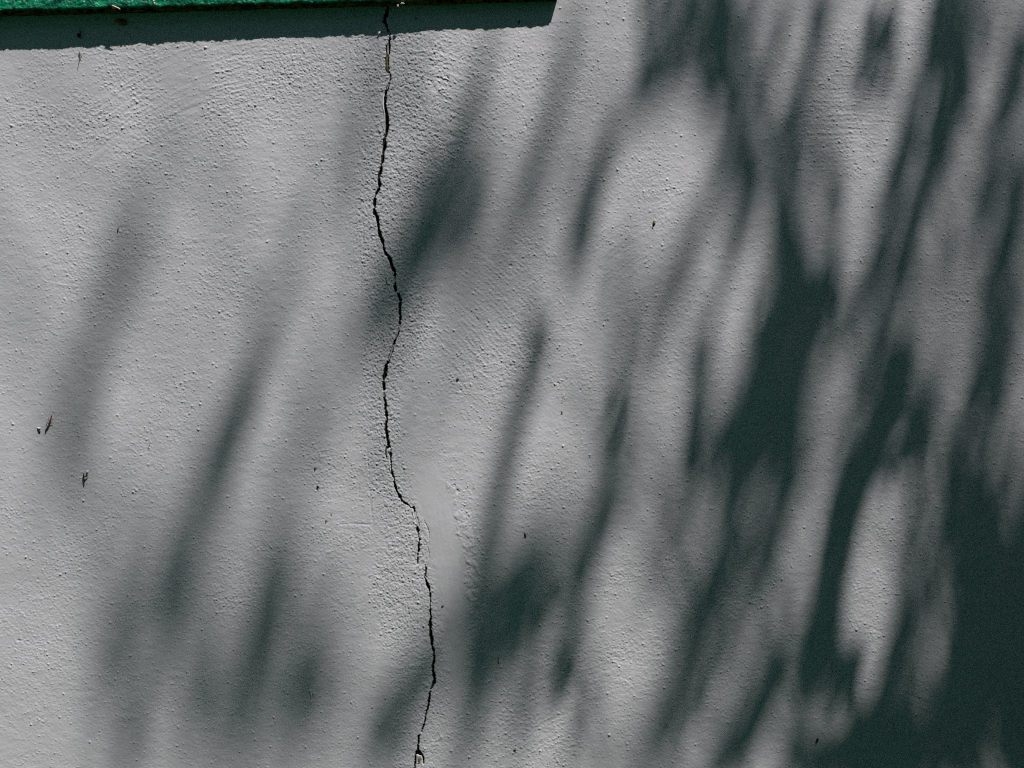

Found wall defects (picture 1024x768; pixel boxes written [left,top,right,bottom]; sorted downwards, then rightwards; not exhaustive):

crack [363,7,436,749]